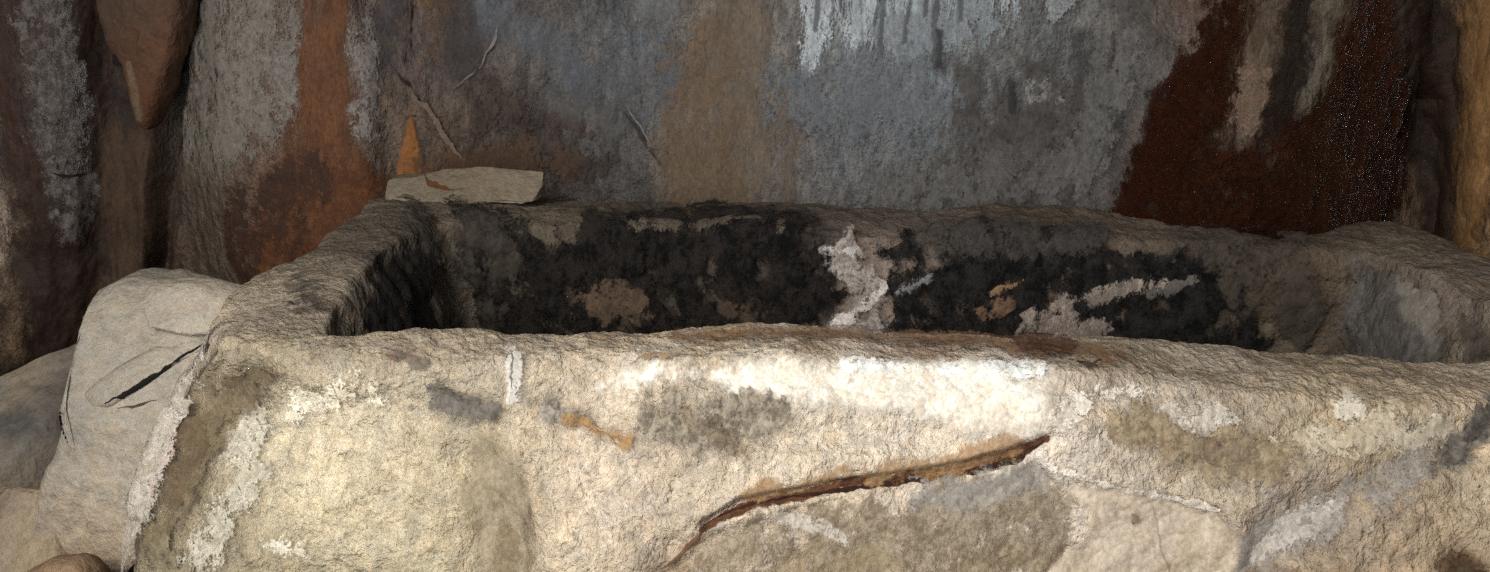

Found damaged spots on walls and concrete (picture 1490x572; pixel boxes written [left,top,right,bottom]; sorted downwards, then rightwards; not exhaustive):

damp [758,0,1490,363]
damp [713,294,758,323]
crack [104,344,202,409]
crack [660,372,1067,569]
damp [601,355,1453,486]